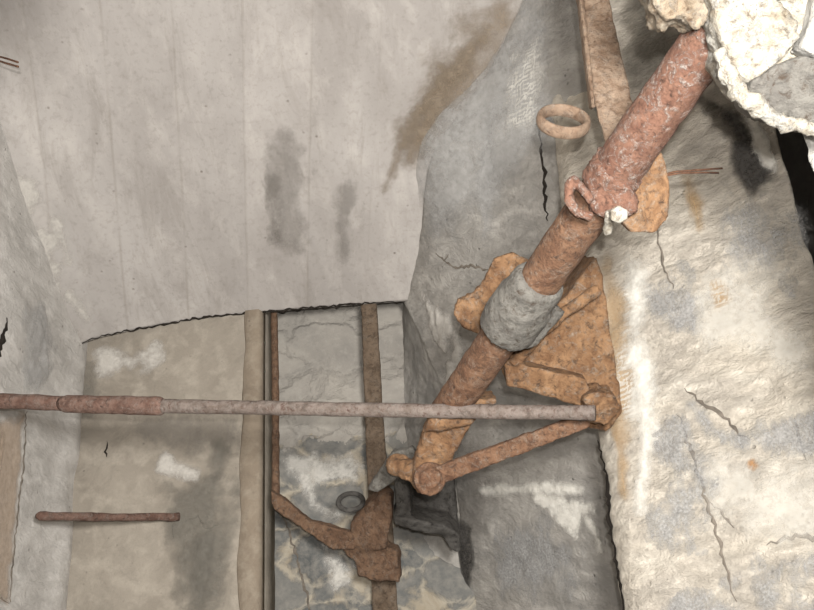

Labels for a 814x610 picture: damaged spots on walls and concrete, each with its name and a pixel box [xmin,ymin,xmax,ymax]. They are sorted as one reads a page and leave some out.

water stain [391,4,544,220]
crack [534,111,548,221]
crack [436,253,488,271]
crack [657,230,674,289]
crack [0,317,8,357]
crack [82,301,397,344]
crack [684,388,750,440]
crack [0,411,28,603]
crack [677,415,737,602]
crack [767,532,814,545]